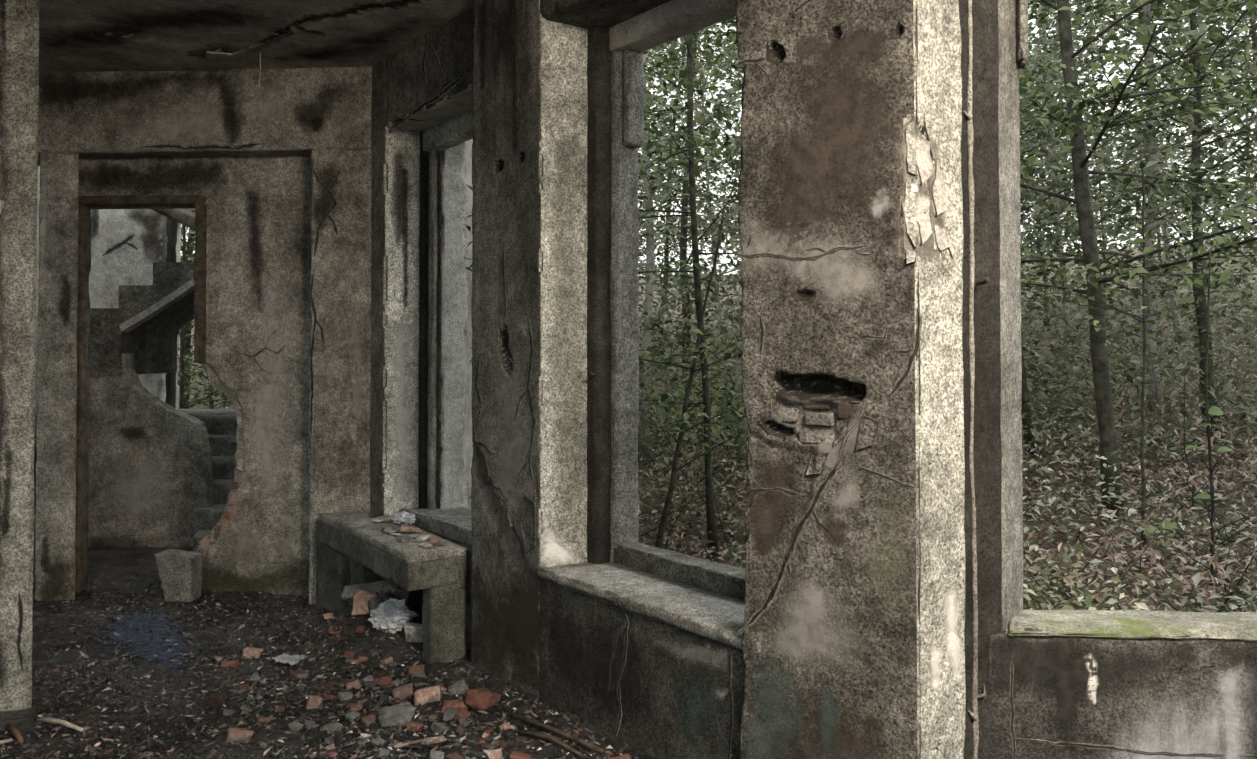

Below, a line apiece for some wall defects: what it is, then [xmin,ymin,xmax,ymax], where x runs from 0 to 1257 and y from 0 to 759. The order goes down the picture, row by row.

crack [258,0,421,43]
leakage [298,87,347,131]
flaking render [896,120,951,264]
leakage [247,193,262,301]
crack [731,235,873,263]
crack [241,170,341,459]
spalling [756,371,879,475]
crack [727,306,922,759]
leakage [994,637,1188,749]
leakage [1116,654,1256,759]